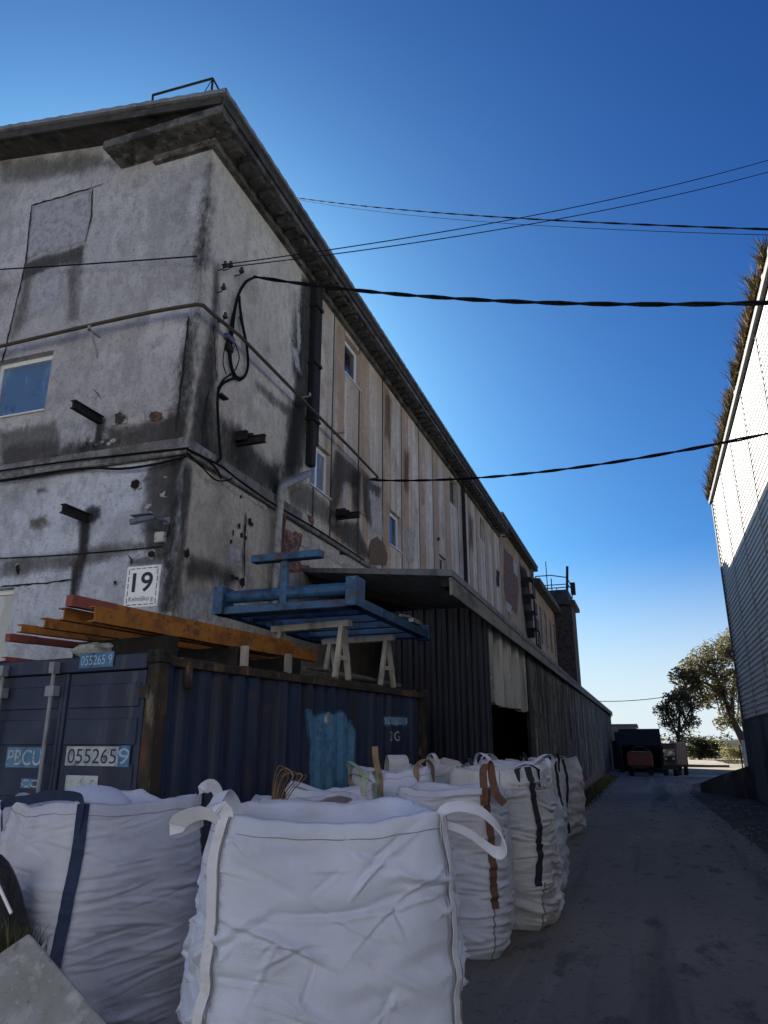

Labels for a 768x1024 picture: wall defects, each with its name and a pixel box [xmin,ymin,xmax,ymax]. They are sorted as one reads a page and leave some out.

leakage [15,246,83,328]
peeling [89,409,179,445]
leakage [1,272,303,494]
leakage [291,450,381,558]